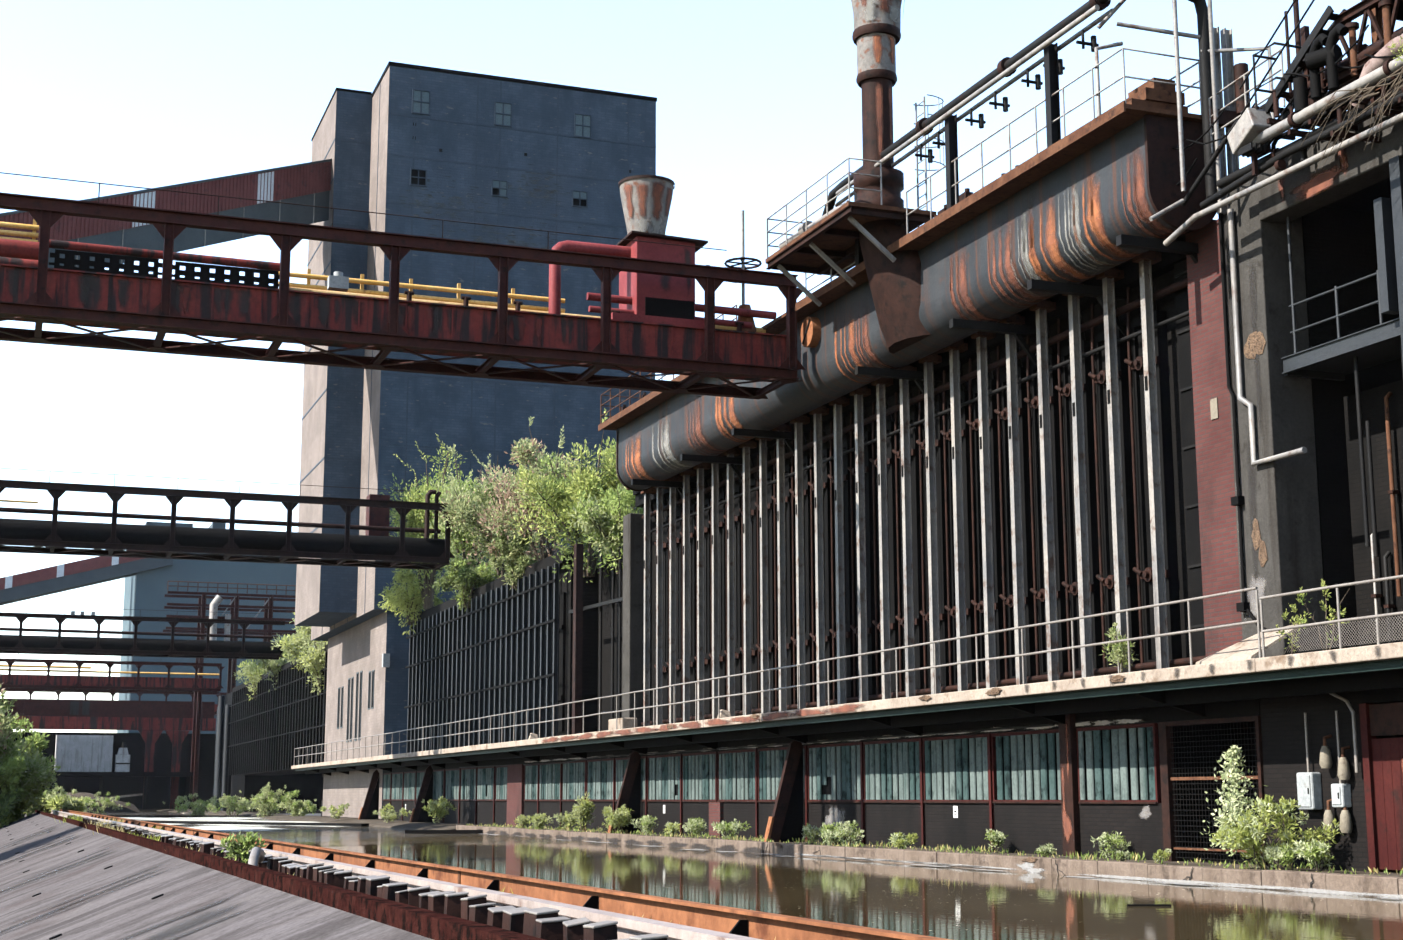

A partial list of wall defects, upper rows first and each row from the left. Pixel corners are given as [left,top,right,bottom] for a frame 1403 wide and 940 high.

corrosion [861,0,905,12]
corrosion [873,35,894,64]
corrosion [876,84,892,155]
corrosion [624,182,672,219]
corrosion [950,159,1187,322]
spalling [1244,331,1266,359]
corrosion [687,396,754,456]
corrosion [626,440,664,487]
spalling [1251,518,1268,567]